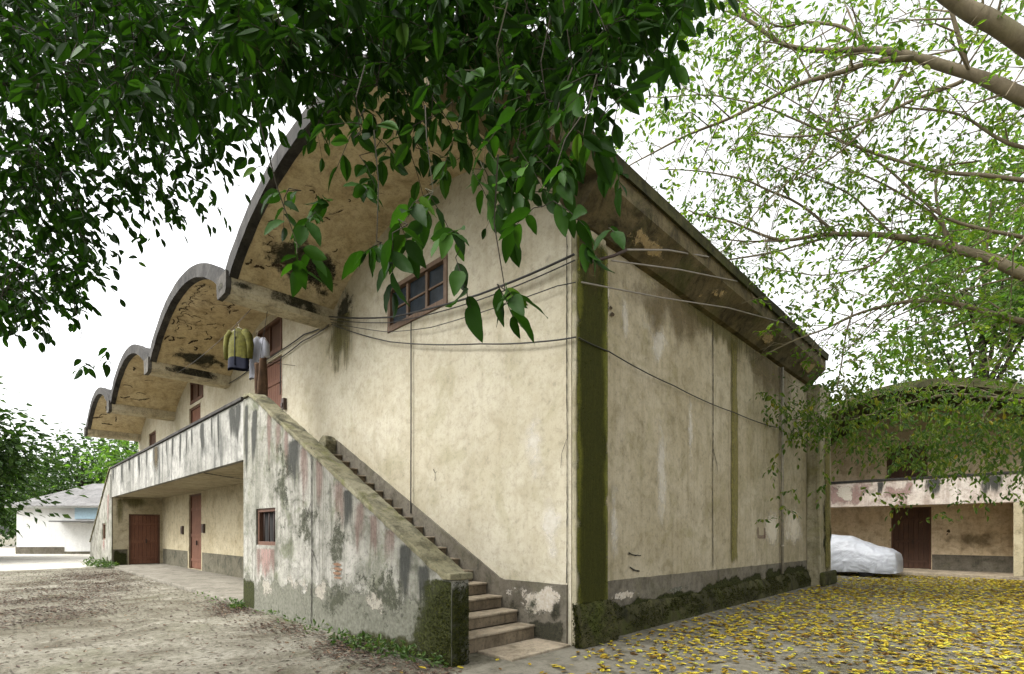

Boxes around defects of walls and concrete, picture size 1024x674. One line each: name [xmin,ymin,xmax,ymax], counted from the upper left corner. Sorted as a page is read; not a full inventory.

flaking render [635,228,663,258]
water stain [263,240,353,357]
water stain [155,349,225,379]
water stain [112,404,257,484]
water stain [269,440,299,509]
peeling [831,483,870,504]
peeling [886,482,912,504]
water stain [281,507,318,541]
water stain [318,490,428,627]
flaking render [245,563,426,652]
flaking render [506,586,561,614]